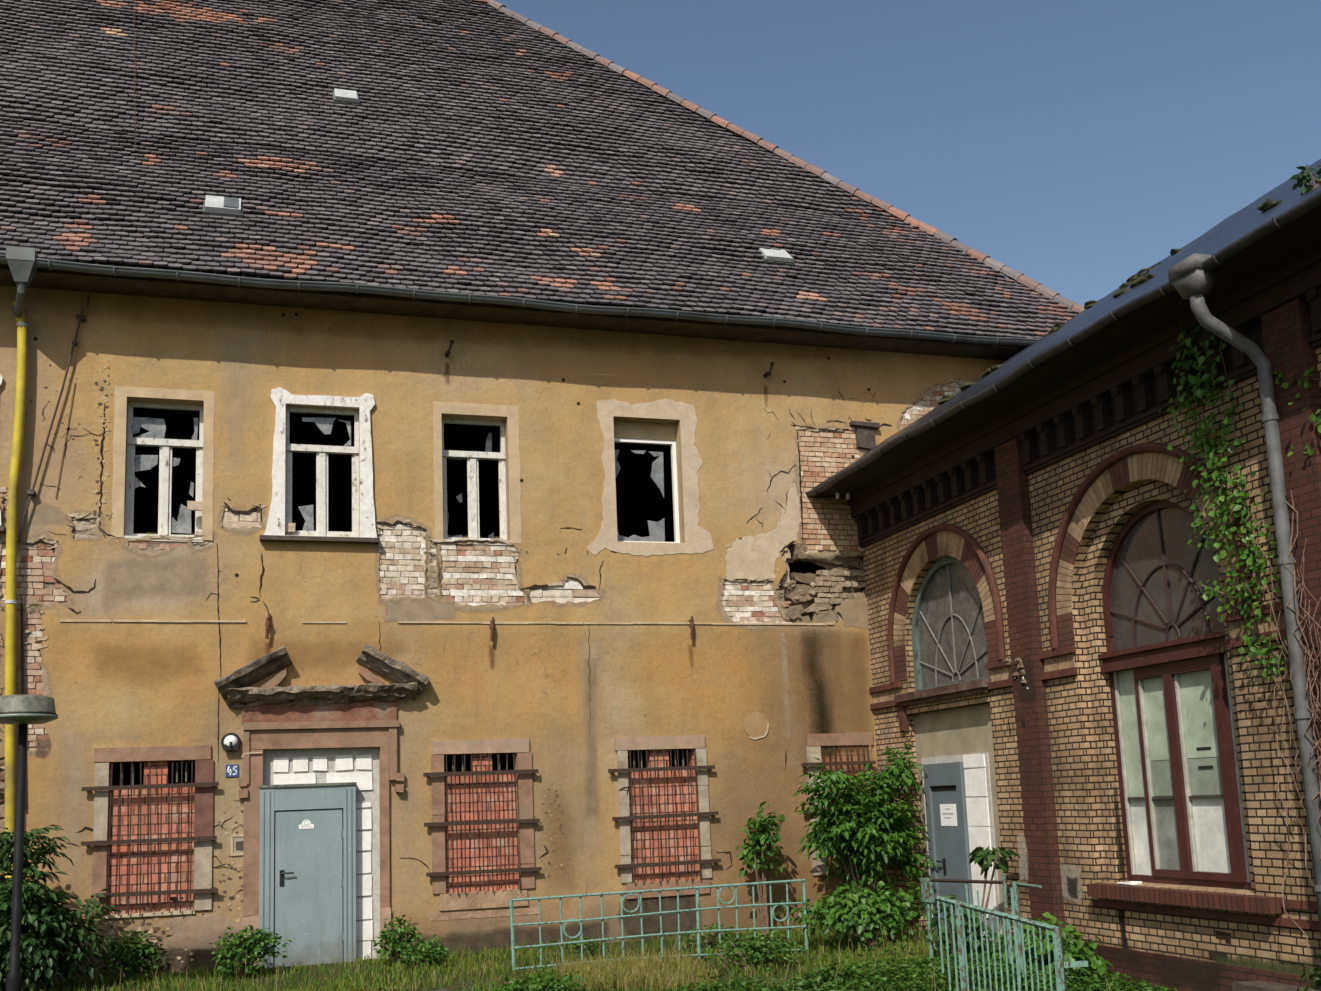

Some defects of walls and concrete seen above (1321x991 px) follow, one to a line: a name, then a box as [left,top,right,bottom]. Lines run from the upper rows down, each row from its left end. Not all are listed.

flaking render [0,366,110,696]
crack [22,403,123,614]
flaking render [187,501,202,511]
flaking render [121,504,268,559]
crack [224,498,262,522]
crack [250,553,269,615]
flaking render [375,515,604,612]
flaking render [717,424,876,630]
crack [724,391,892,590]
flaking render [27,724,51,754]
crack [205,545,223,759]
leakage [806,633,833,752]